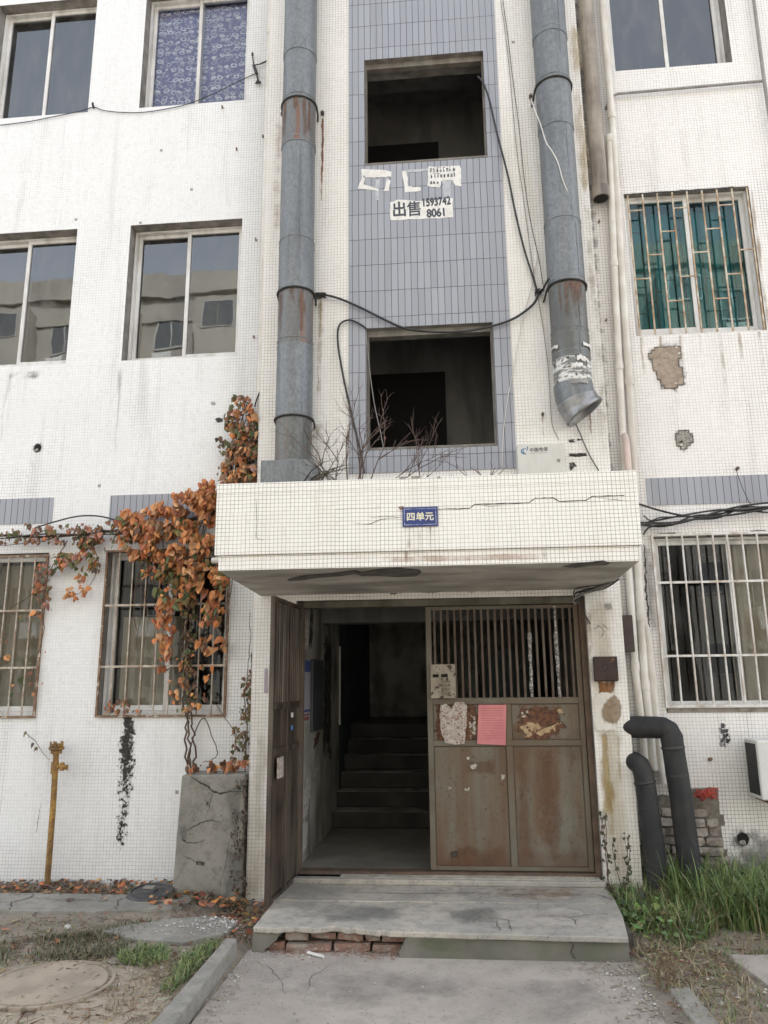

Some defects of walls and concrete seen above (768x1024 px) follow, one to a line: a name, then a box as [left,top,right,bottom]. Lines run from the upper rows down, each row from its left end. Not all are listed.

rust [283,96,324,195]
spalling [648,346,685,390]
spalling [675,429,694,450]
crack [439,495,638,510]
peeling [593,692,621,731]
crack [180,777,242,881]
crack [491,893,613,959]